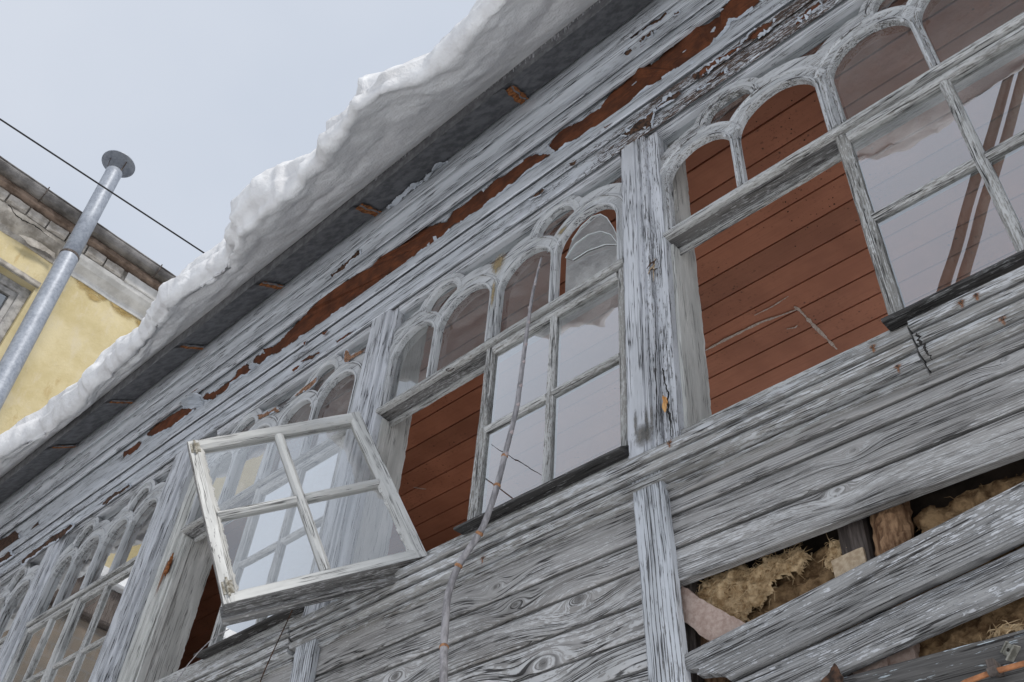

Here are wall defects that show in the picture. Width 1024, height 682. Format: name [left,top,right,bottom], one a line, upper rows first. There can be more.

peeling [795,0,823,25]
peeling [123,0,776,459]
crack [654,307,672,437]
crack [915,333,932,360]